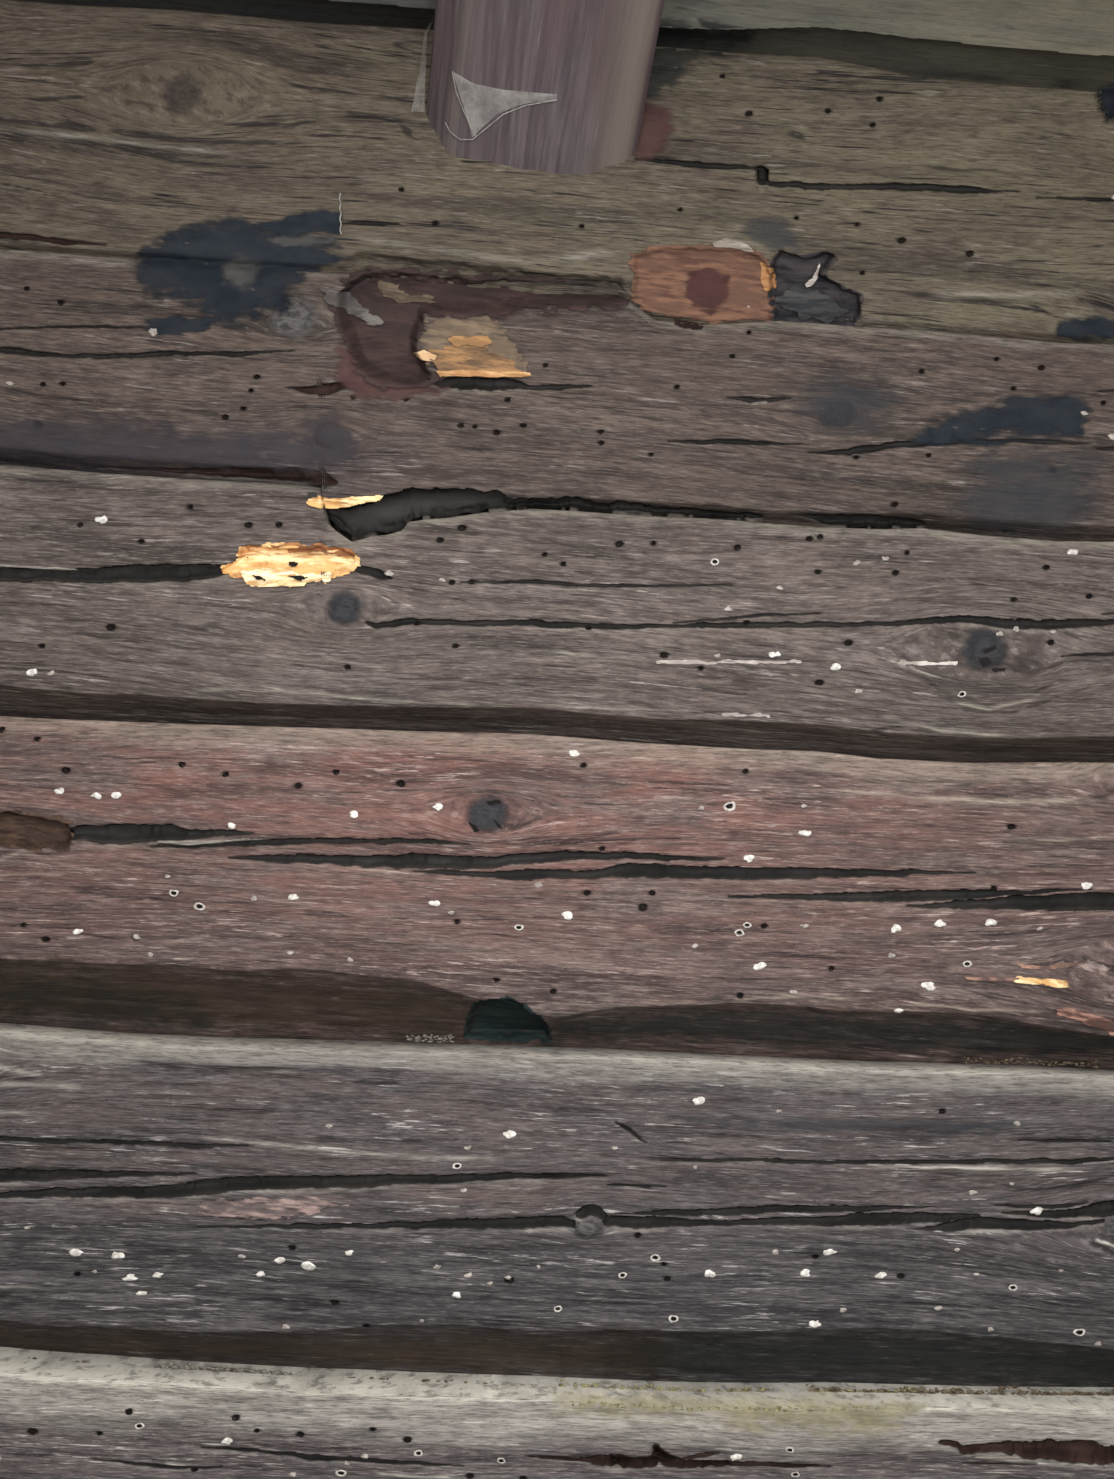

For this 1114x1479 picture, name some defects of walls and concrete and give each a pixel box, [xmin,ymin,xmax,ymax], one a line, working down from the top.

leakage [136,210,344,335]
peeling [713,238,776,291]
peeling [413,336,531,377]
leakage [913,396,1091,529]
crack [100,467,762,579]
crack [800,514,924,527]
peeling [240,542,356,585]
crack [366,580,1114,657]
crack [70,823,1114,911]
crack [0,1122,1114,1231]
crack [527,1444,831,1468]
crack [939,1438,1114,1465]